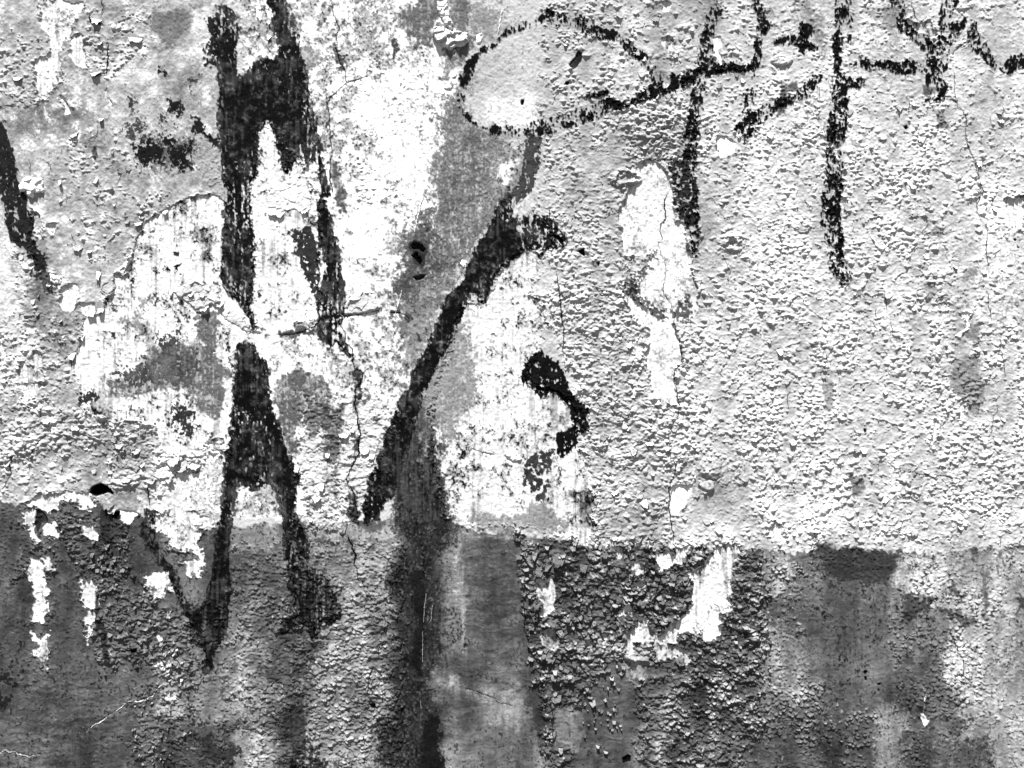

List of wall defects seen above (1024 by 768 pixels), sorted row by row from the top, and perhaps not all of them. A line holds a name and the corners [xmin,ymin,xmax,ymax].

peeling [12,0,100,115]
crack [327,2,367,191]
peeling [661,35,684,58]
peeling [0,121,322,485]
peeling [618,148,699,409]
peeling [20,489,215,768]
crack [278,309,410,587]
leakage [372,401,469,768]
peeling [427,242,772,738]
leakage [901,733,941,768]